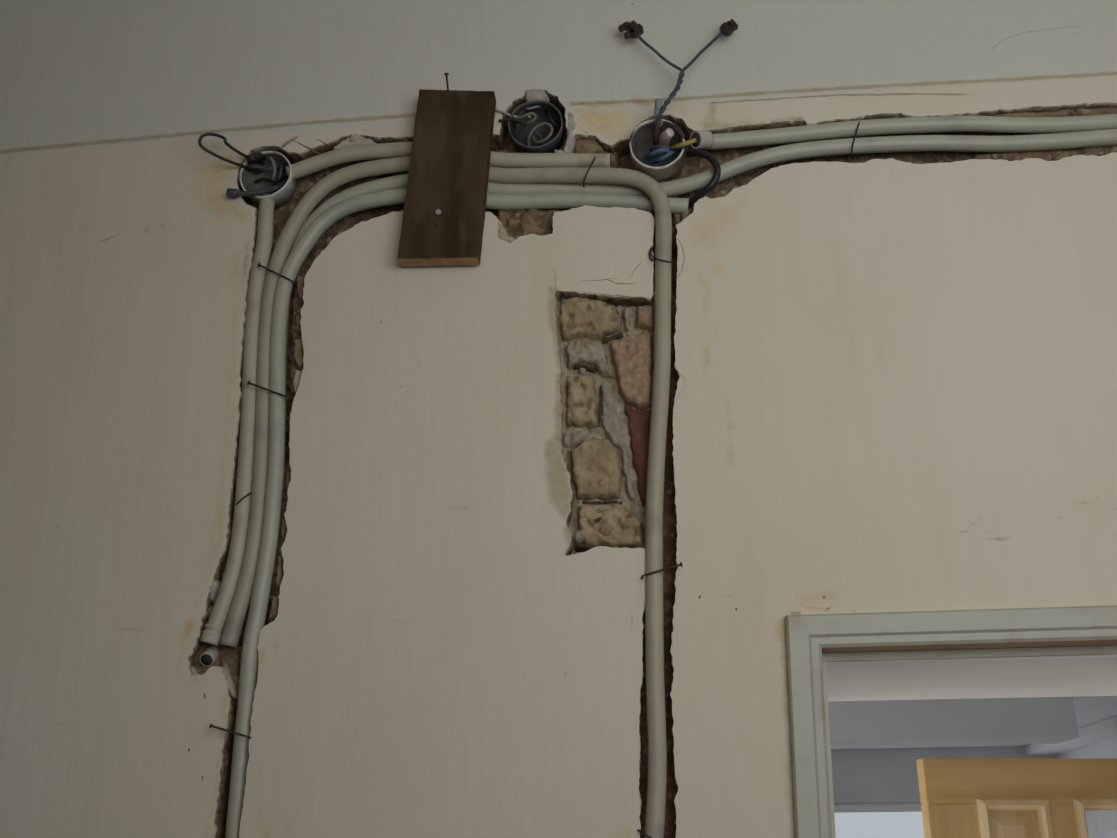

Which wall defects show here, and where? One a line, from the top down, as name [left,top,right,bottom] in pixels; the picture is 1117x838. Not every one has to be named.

spalling [995,107,1117,117]
spalling [971,145,1117,161]
spalling [498,209,561,243]
spalling [290,272,307,403]
spalling [548,290,655,555]
spalling [268,463,291,623]
spalling [190,643,242,699]